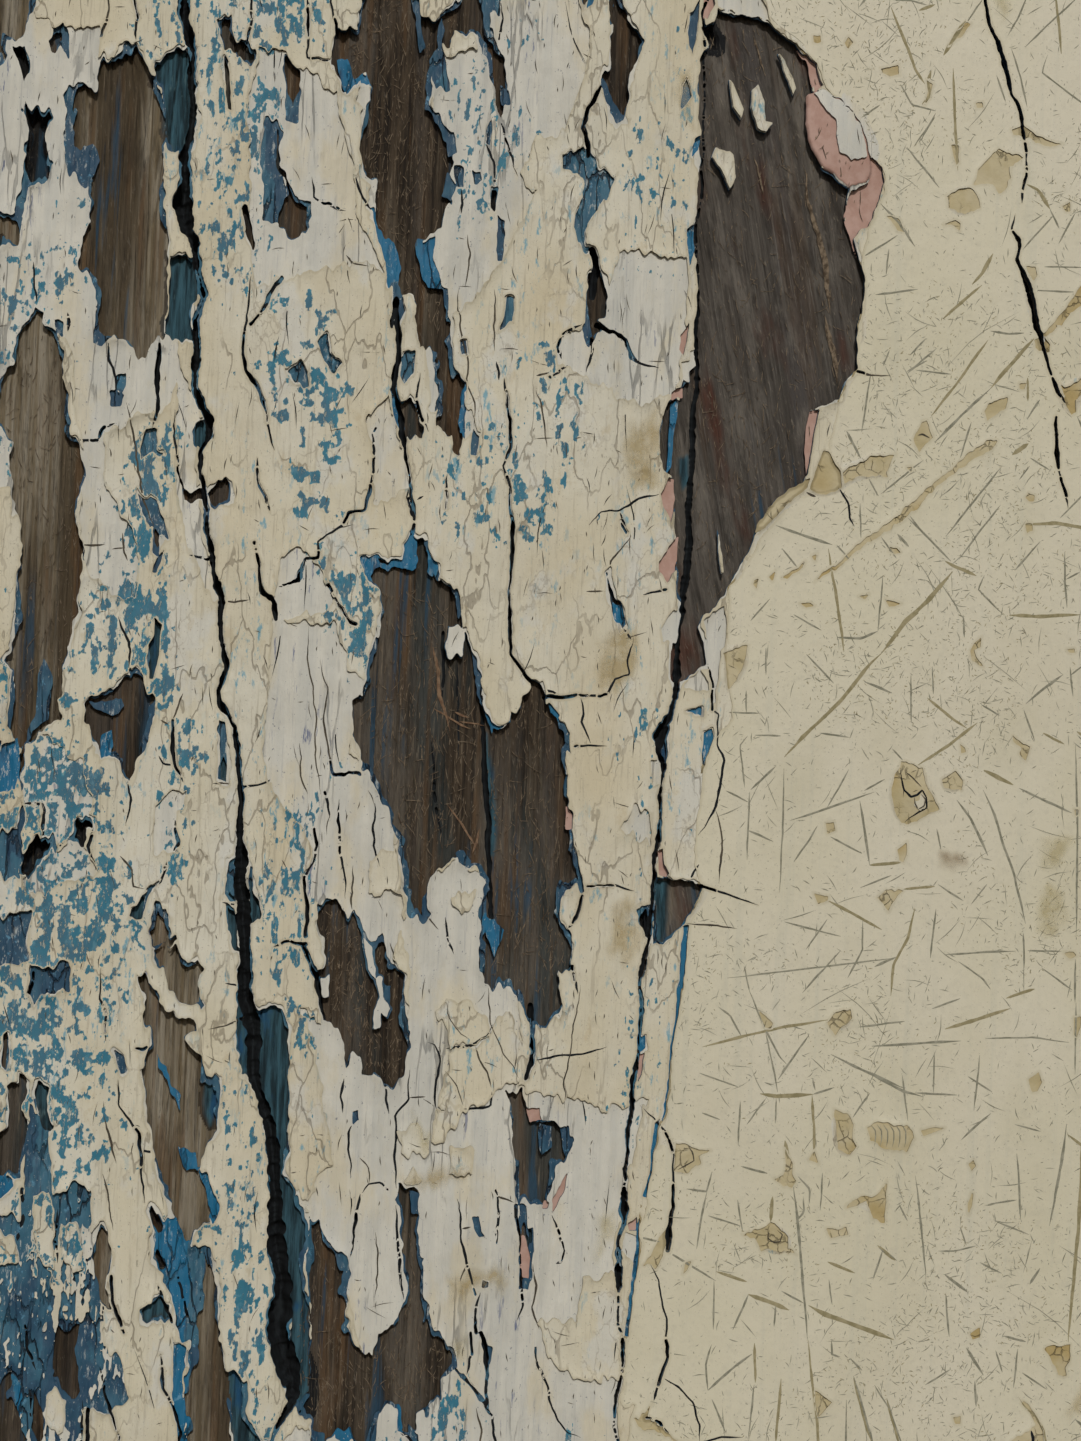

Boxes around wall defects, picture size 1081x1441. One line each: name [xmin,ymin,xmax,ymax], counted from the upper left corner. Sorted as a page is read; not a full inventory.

peeling [0,1032,129,1441]
peeling [0,0,231,1004]
crack [0,0,633,1441]
peeling [114,528,709,1441]
peeling [218,0,645,505]
crack [431,0,669,919]
peeling [557,0,913,765]
peeling [753,440,998,587]
peeling [914,421,933,452]
peeling [892,761,963,825]
peeling [985,383,1027,421]
peeling [1012,1398,1047,1441]